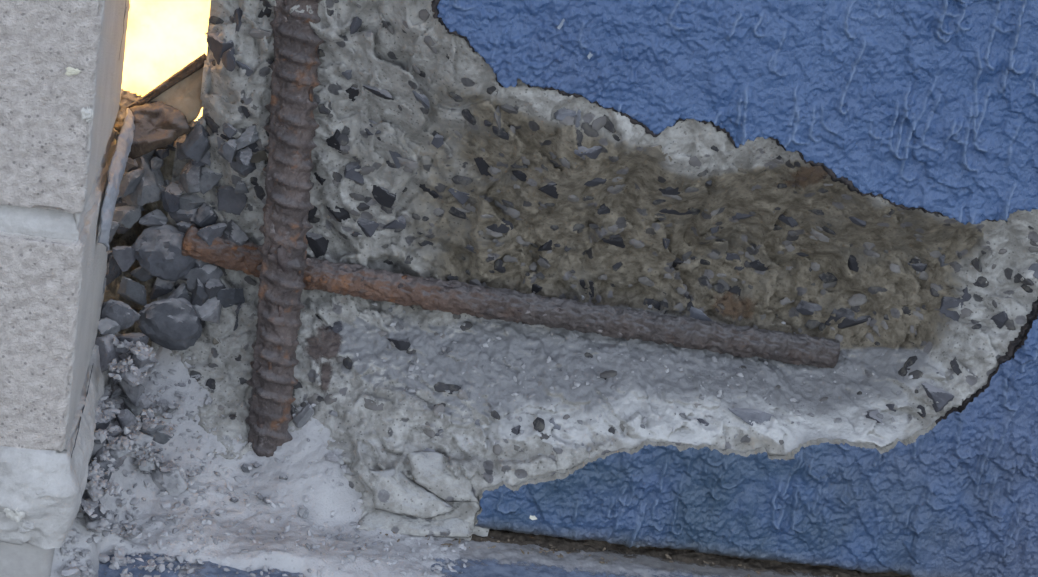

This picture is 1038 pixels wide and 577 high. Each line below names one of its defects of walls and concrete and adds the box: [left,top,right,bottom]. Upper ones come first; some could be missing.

spalling [114,89,142,132]
spalling [153,0,276,245]
spalling [109,200,178,250]
spalling [288,0,1038,541]
spalling [103,260,260,460]
corrosion [306,324,342,391]
peeling [431,558,640,577]